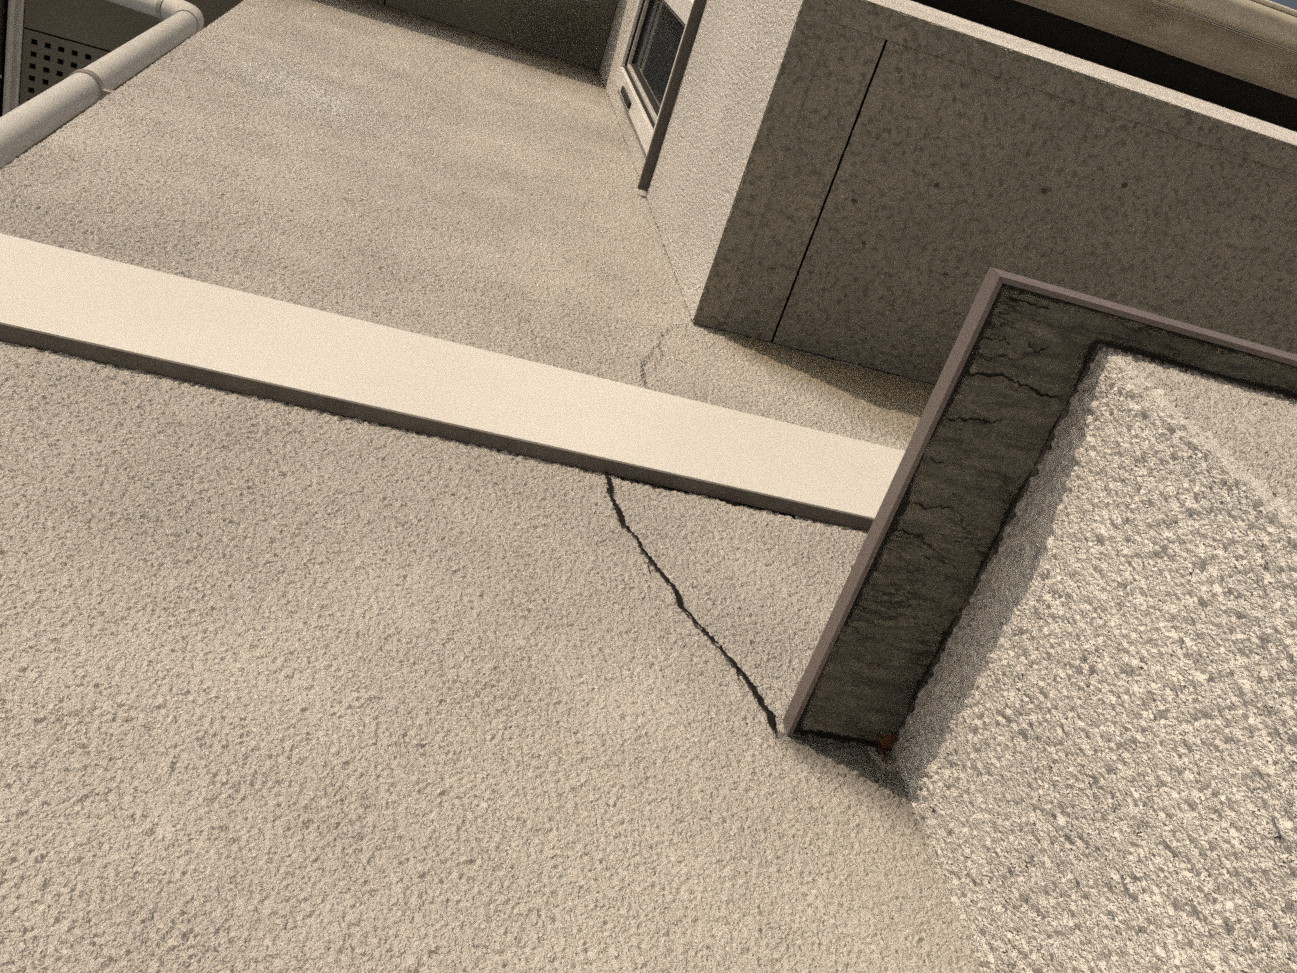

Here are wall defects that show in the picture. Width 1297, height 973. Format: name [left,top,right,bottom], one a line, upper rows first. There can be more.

crack [604,472,882,748]